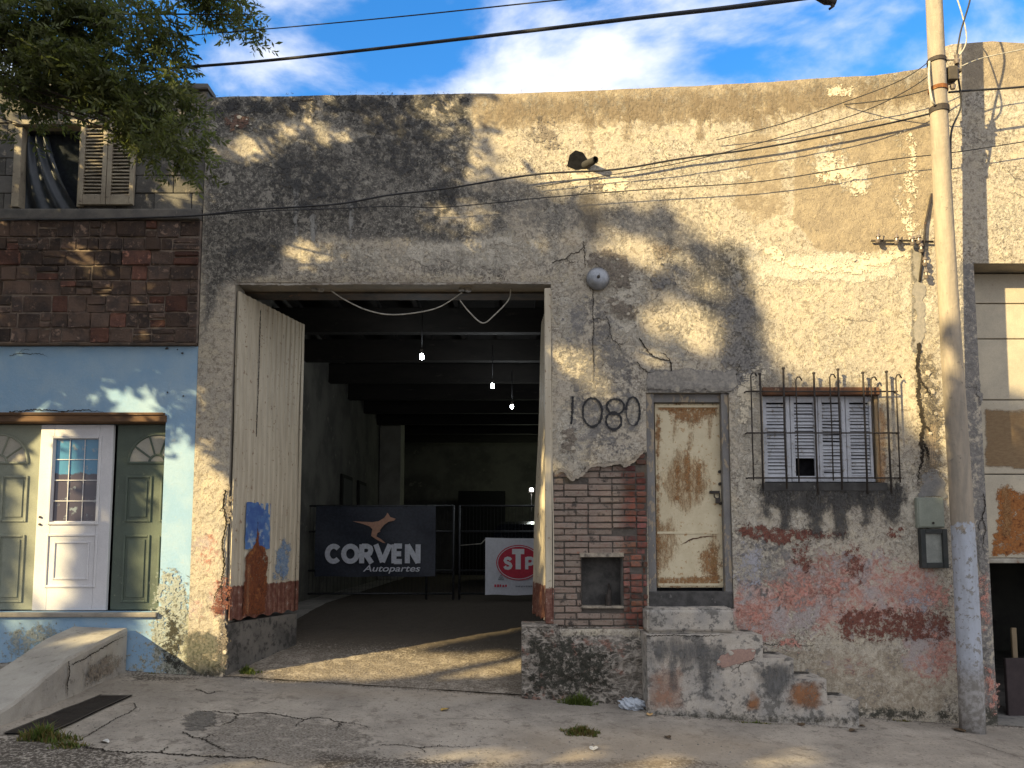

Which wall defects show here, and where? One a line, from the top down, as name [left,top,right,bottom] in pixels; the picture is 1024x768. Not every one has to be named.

spalling [758,130,923,276]
crack [552,241,672,381]
crack [915,342,933,484]
crack [67,637,129,695]
rust [242,529,268,616]
flaking render [553,451,648,629]
rust [655,403,723,587]
damp [656,641,725,698]
damp [763,667,789,696]
spalling [732,522,866,620]
damp [758,481,907,539]
spalling [835,594,952,648]